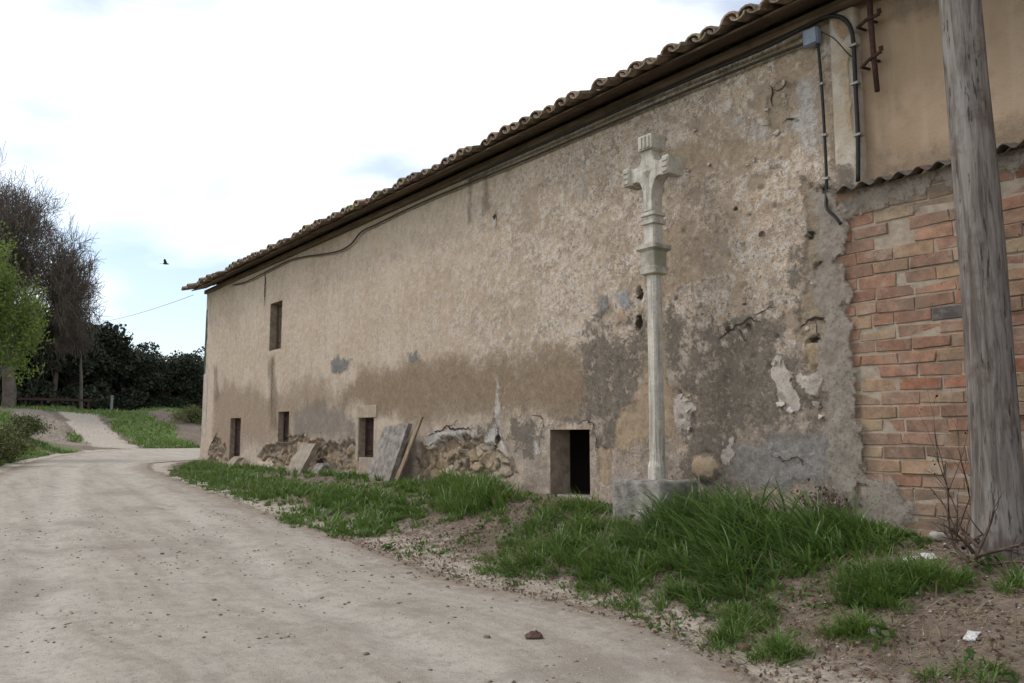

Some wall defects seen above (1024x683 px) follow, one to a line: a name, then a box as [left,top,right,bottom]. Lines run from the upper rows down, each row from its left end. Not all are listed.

water stain [213,306,648,459]
spalling [615,329,649,452]
peeling [663,359,697,437]
water stain [662,244,829,499]
crack [719,305,777,342]
peeling [770,355,824,419]
crack [800,316,825,339]
spalling [795,176,833,348]